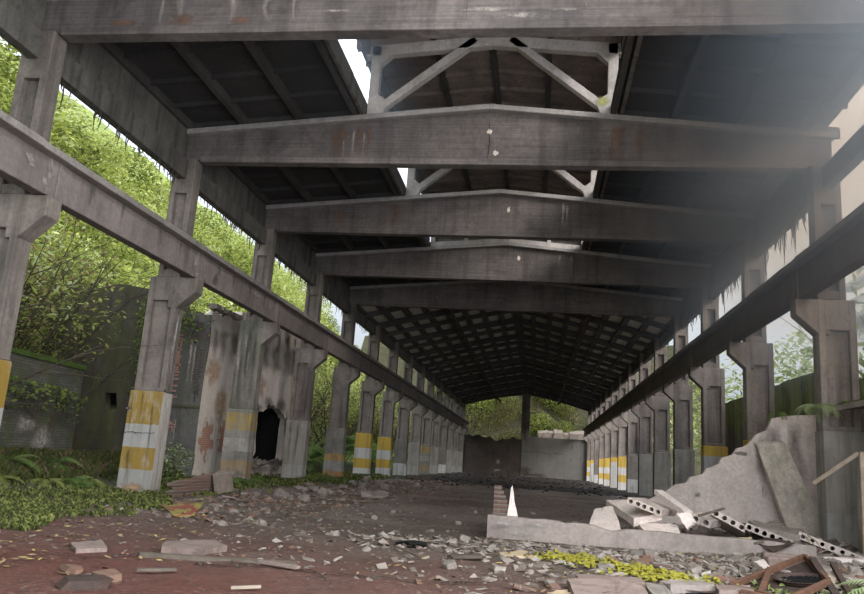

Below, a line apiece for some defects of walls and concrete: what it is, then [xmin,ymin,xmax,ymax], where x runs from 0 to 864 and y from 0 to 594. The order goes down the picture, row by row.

spalling [166,392,241,499]